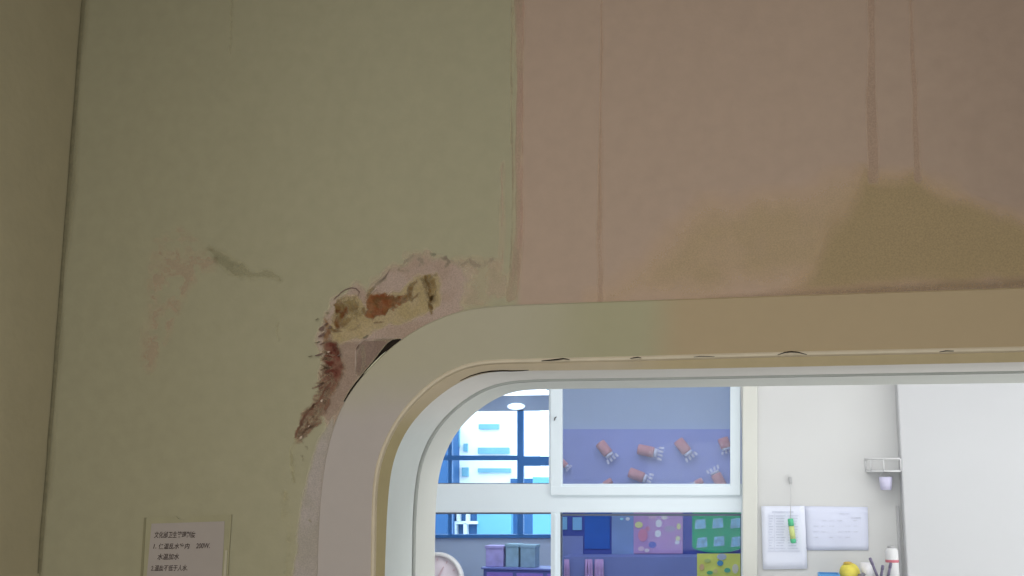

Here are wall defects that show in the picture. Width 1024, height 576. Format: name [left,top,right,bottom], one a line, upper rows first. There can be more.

damp [646,0,1024,293]
corrosion [295,274,440,442]
crack [343,339,401,402]
peeling [291,251,506,576]